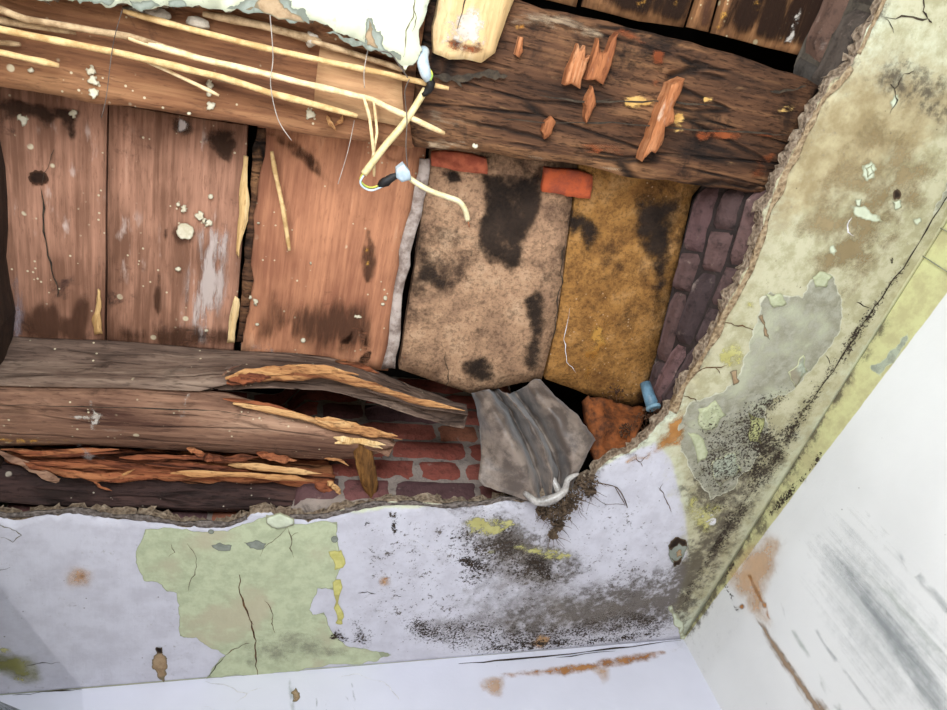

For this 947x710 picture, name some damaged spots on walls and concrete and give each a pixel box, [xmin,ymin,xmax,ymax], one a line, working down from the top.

peeling [228,0,309,24]
peeling [326,18,401,60]
damp [723,0,823,45]
crack [885,0,932,33]
damp [525,292,544,370]
spalling [668,66,854,500]
damp [678,260,909,614]
crack [205,575,274,710]
peeling [0,495,525,682]
damp [363,506,665,652]
corrosion [534,652,664,675]
corrosion [723,546,825,710]